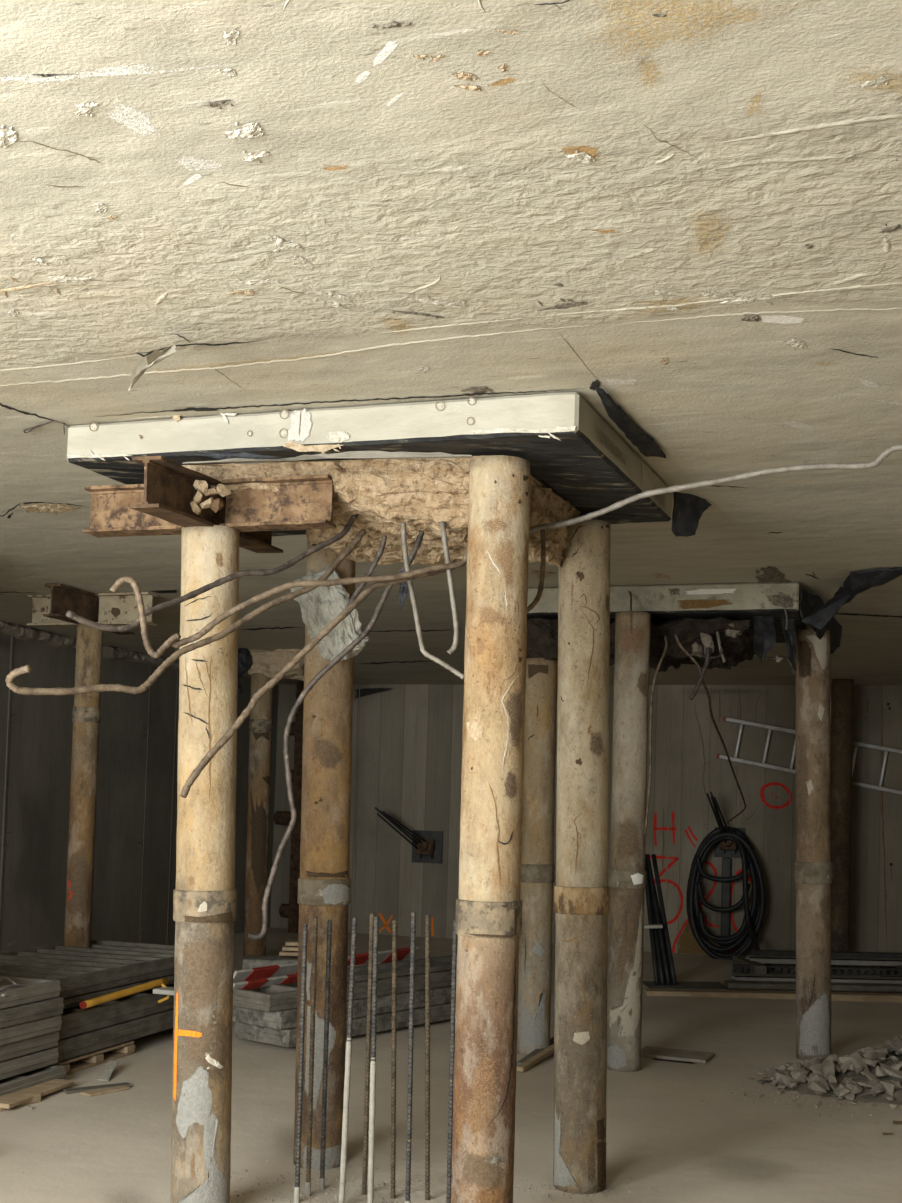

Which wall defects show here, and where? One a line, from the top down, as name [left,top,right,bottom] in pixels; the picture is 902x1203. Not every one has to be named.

spalling [201,100,233,109]
spalling [0,124,17,148]
spalling [224,122,271,163]
crack [26,141,100,188]
crack [0,502,89,518]